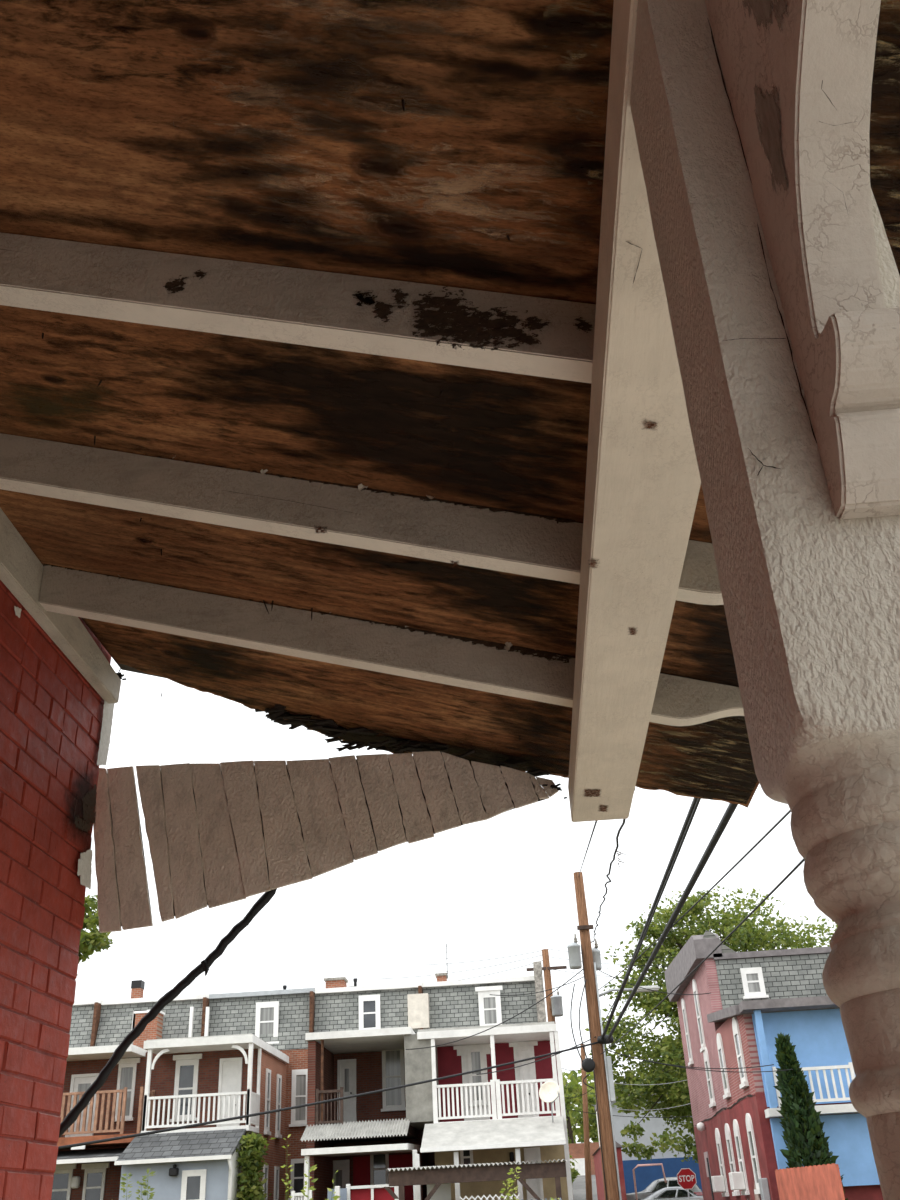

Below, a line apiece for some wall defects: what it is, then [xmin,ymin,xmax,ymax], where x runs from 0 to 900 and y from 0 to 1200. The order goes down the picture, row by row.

water stain [61,0,612,288]
water stain [869,11,900,275]
peeling [163,269,207,293]
peeling [352,286,551,351]
water stain [0,323,591,516]
water stain [100,628,411,723]
water stain [255,541,577,658]
water stain [660,600,739,687]
water stain [488,695,572,775]
water stain [639,716,758,804]